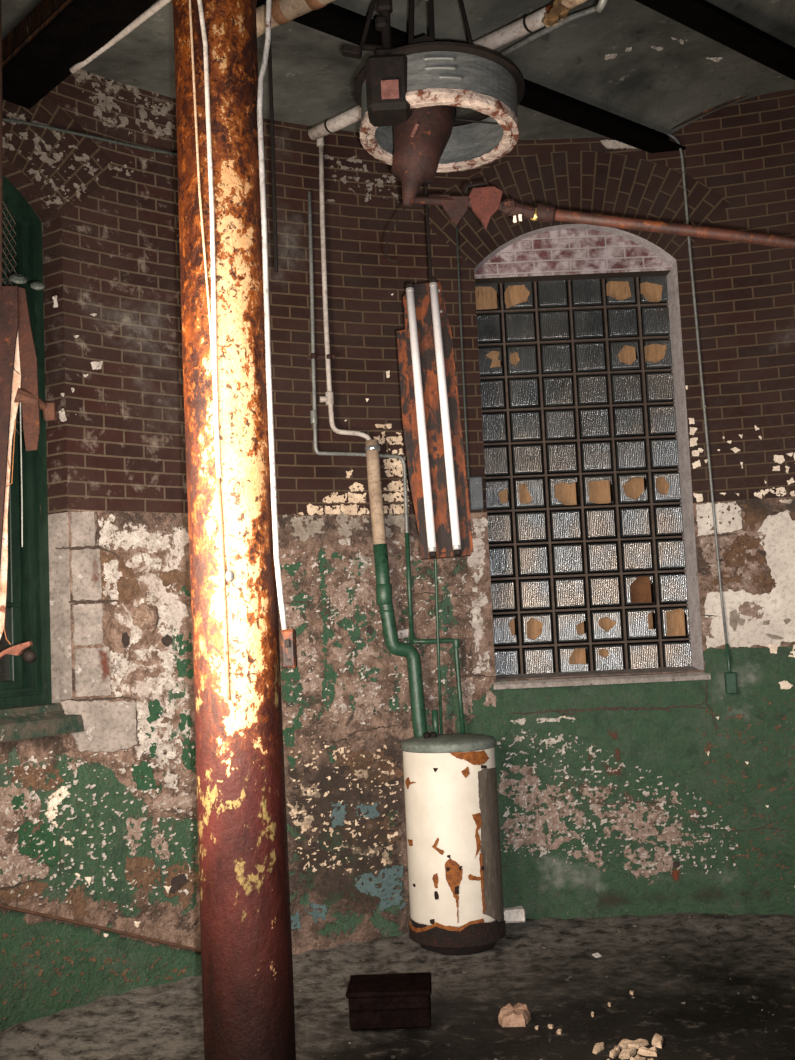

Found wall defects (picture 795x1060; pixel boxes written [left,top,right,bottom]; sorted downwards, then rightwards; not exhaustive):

peeling [2,112,153,208]
peeling [76,69,175,140]
peeling [688,418,708,469]
spalling [373,424,497,732]
peeling [693,452,795,658]
peeling [278,470,411,929]
peeling [497,680,795,885]